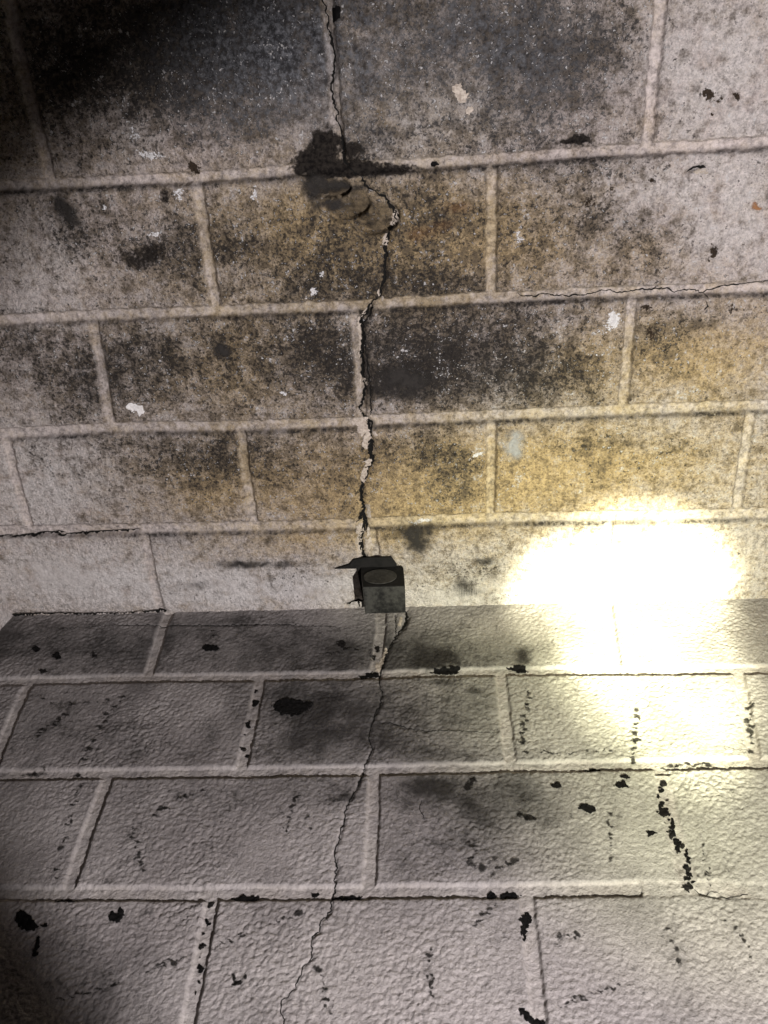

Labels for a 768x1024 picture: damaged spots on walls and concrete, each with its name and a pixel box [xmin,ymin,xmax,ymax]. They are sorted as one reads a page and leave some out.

water stain [126,121,165,161]
crack [322,0,400,557]
crack [518,280,767,309]
crack [280,612,494,1024]
peeling [656,780,695,893]